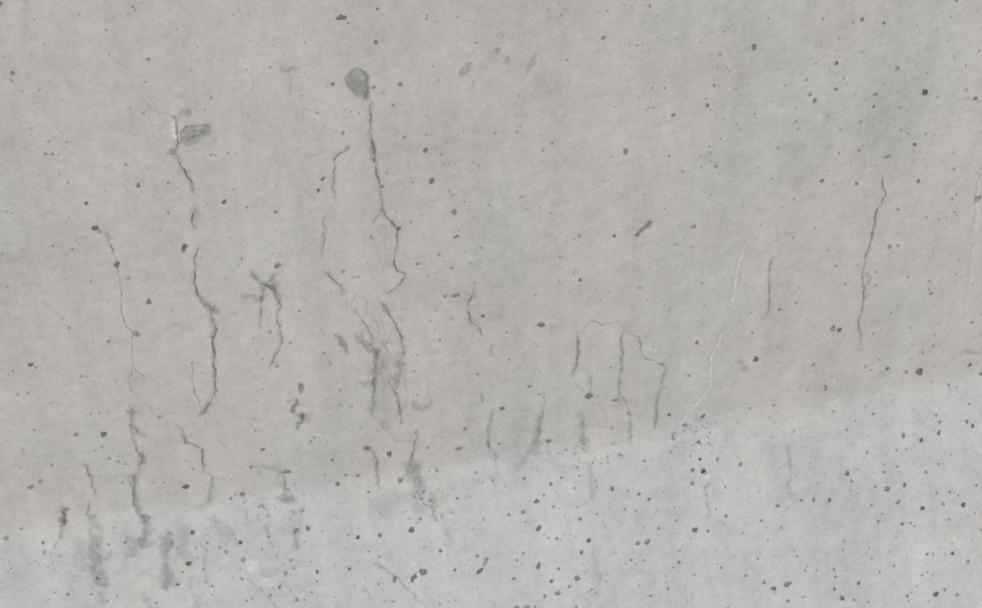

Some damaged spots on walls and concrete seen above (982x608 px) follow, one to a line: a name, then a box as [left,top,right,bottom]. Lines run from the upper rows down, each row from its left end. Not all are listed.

crack [106,233,148,523]
crack [140,96,217,510]
crack [253,273,283,364]
crack [322,105,429,474]
crack [563,319,667,445]
crack [858,178,887,341]